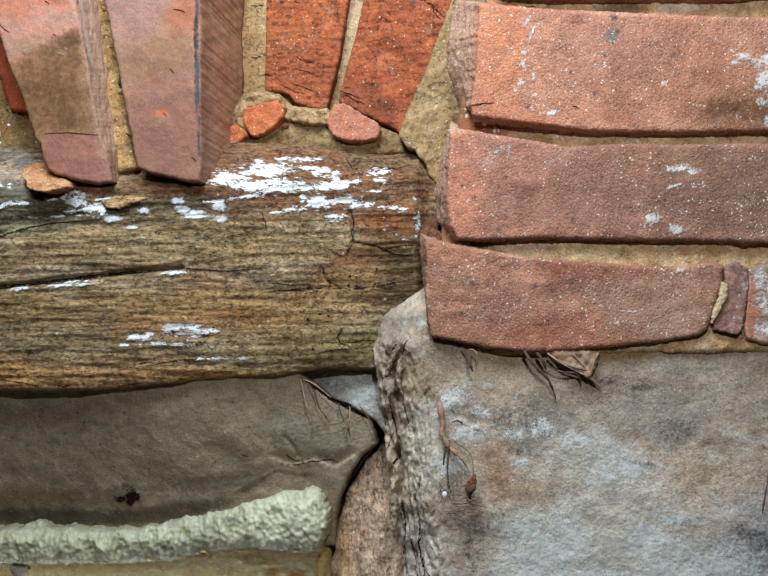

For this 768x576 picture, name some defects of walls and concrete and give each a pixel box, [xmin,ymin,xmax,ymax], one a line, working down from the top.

leakage [731,53,768,129]
leakage [43,190,137,229]
leakage [172,156,421,238]
crack [0,214,423,293]
leakage [751,268,768,313]
leakage [120,322,220,347]